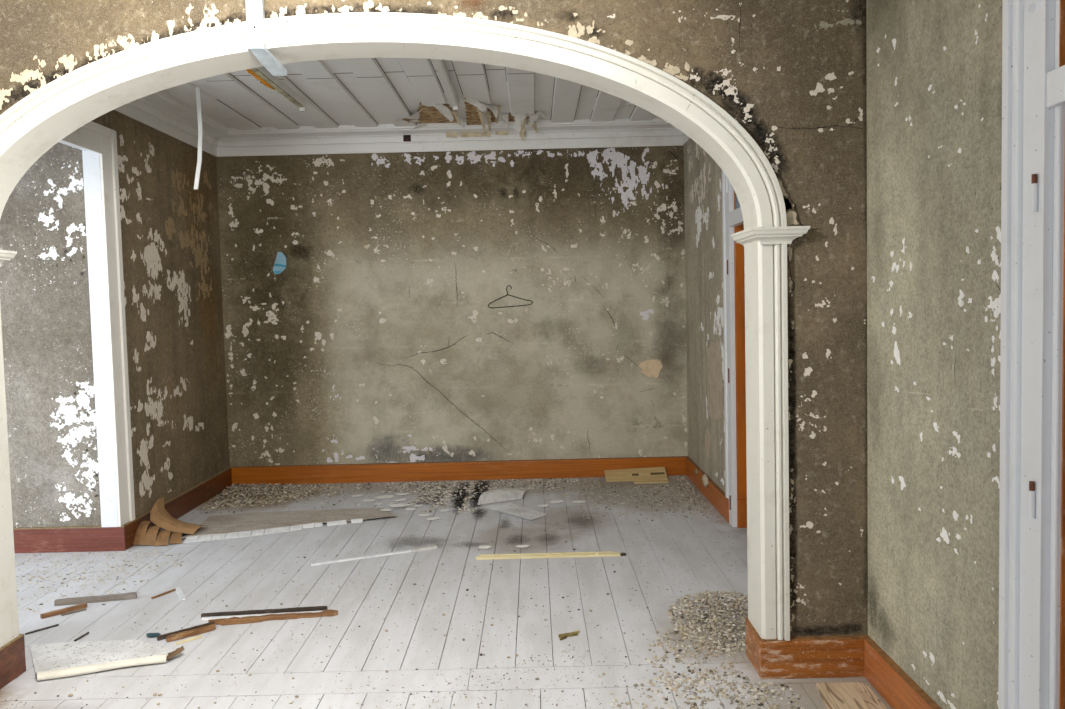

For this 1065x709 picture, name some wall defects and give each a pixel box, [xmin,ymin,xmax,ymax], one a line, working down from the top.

peeling [0,4,244,110]
peeling [568,13,700,81]
peeling [713,38,781,123]
peeling [38,162,86,267]
peeling [50,381,99,522]
peeling [117,134,212,498]
peeling [225,278,299,465]
peeling [227,154,346,283]
crack [376,332,510,449]
peeling [354,144,721,336]
flaking render [764,126,821,226]
peeling [958,226,1001,375]